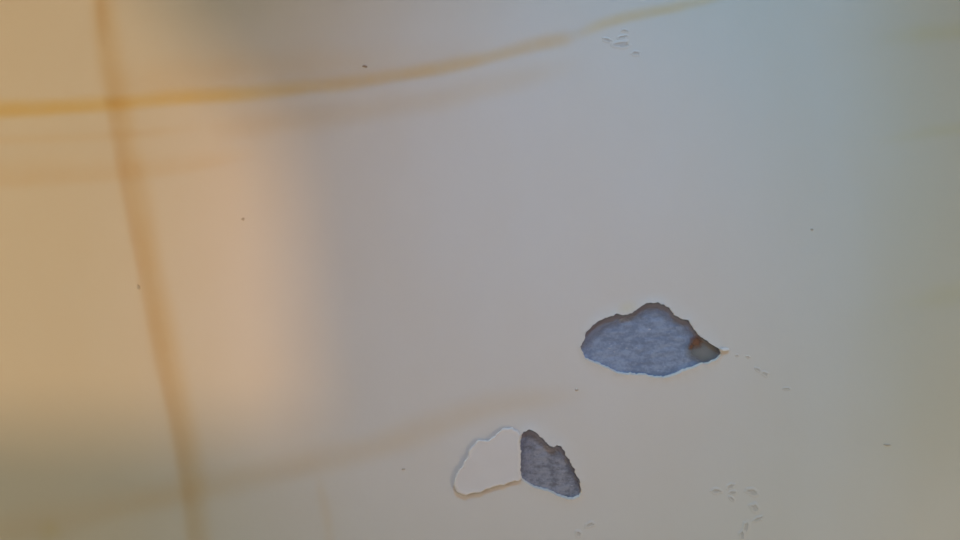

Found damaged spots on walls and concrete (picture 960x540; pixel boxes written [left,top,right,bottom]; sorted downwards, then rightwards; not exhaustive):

peeling [572,291,729,392]
peeling [454,417,595,513]